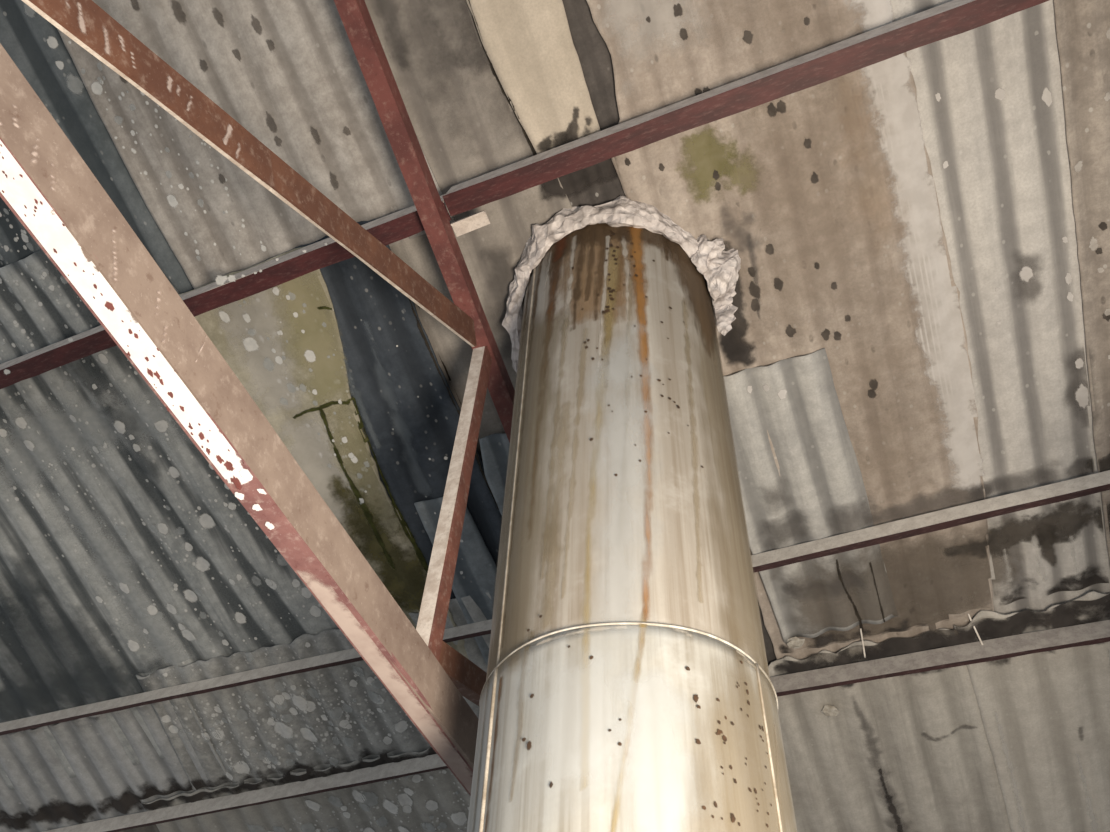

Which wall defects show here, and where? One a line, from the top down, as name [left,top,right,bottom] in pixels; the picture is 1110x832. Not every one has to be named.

damp [673,3,688,40]
damp [768,100,786,117]
damp [538,108,591,151]
damp [541,158,631,199]
damp [1088,454,1110,472]
corrosion [524,223,716,832]
damp [775,501,1110,674]